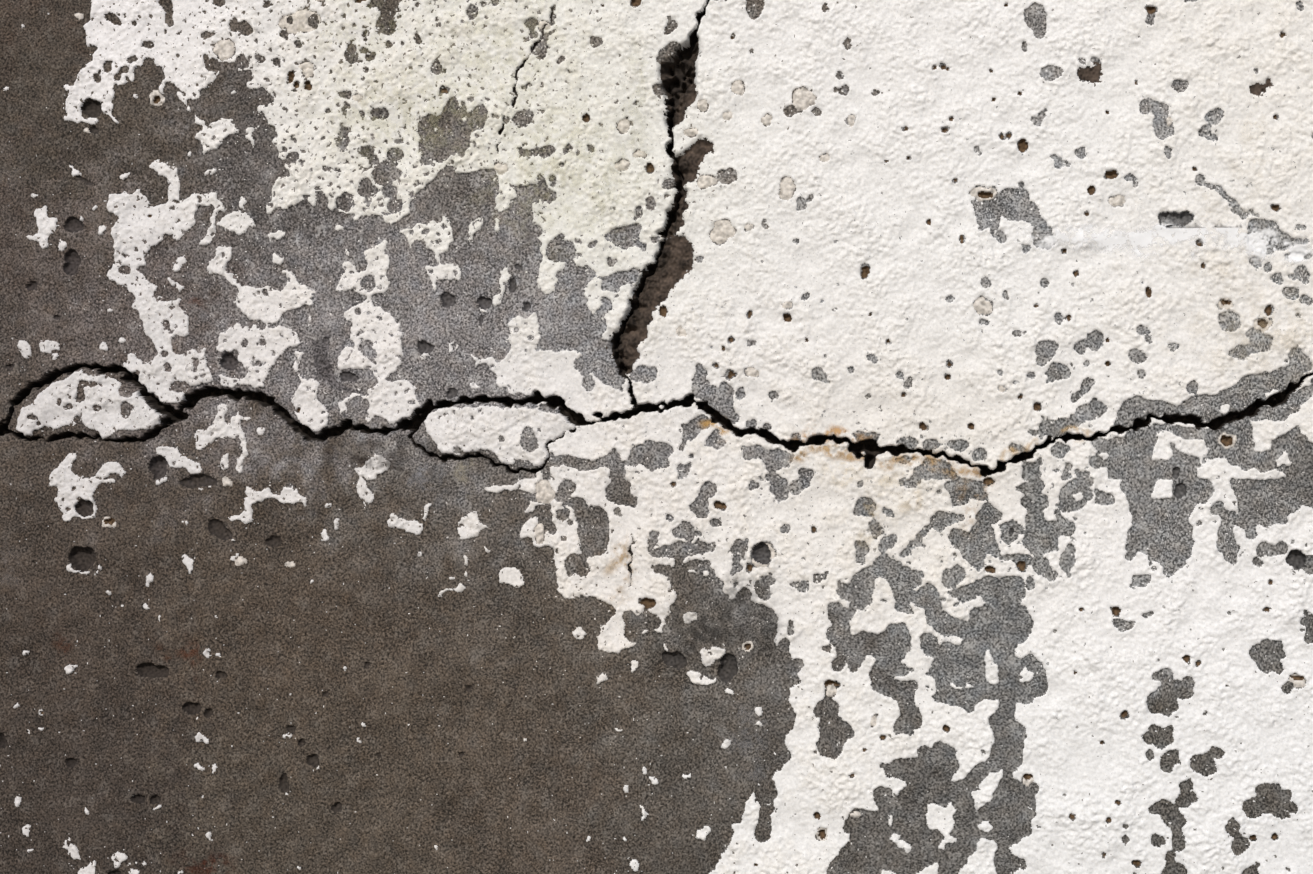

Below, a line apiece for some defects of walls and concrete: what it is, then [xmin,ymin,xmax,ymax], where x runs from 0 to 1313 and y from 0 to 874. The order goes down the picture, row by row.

peeling [1021,2,1047,52]
spalling [1000,133,1028,152]
peeling [1139,97,1174,159]
peeling [1087,170,1138,195]
crack [0,0,1313,477]
peeling [971,181,1067,254]
spalling [1158,211,1194,227]
peeling [1192,167,1313,306]
peeling [1073,329,1110,366]
peeling [1128,325,1179,379]
peeling [1218,305,1273,361]
peeling [0,0,814,874]